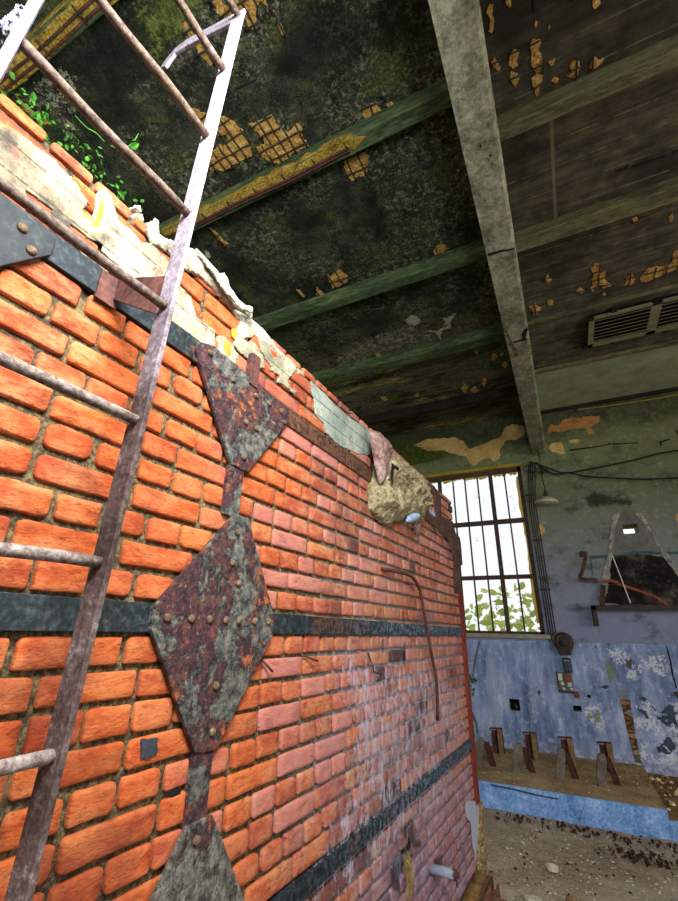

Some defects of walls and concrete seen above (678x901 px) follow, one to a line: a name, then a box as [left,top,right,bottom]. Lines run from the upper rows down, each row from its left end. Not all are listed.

spalling [25,0,118,60]
damp [133,0,207,61]
spalling [207,0,286,37]
spalling [0,51,49,126]
damp [33,69,81,143]
peeling [0,126,169,278]
spalling [194,114,370,248]
peeling [172,286,298,394]
damp [337,313,456,366]
peeling [310,381,372,456]
peeling [413,424,525,465]
flaking render [620,697,678,763]